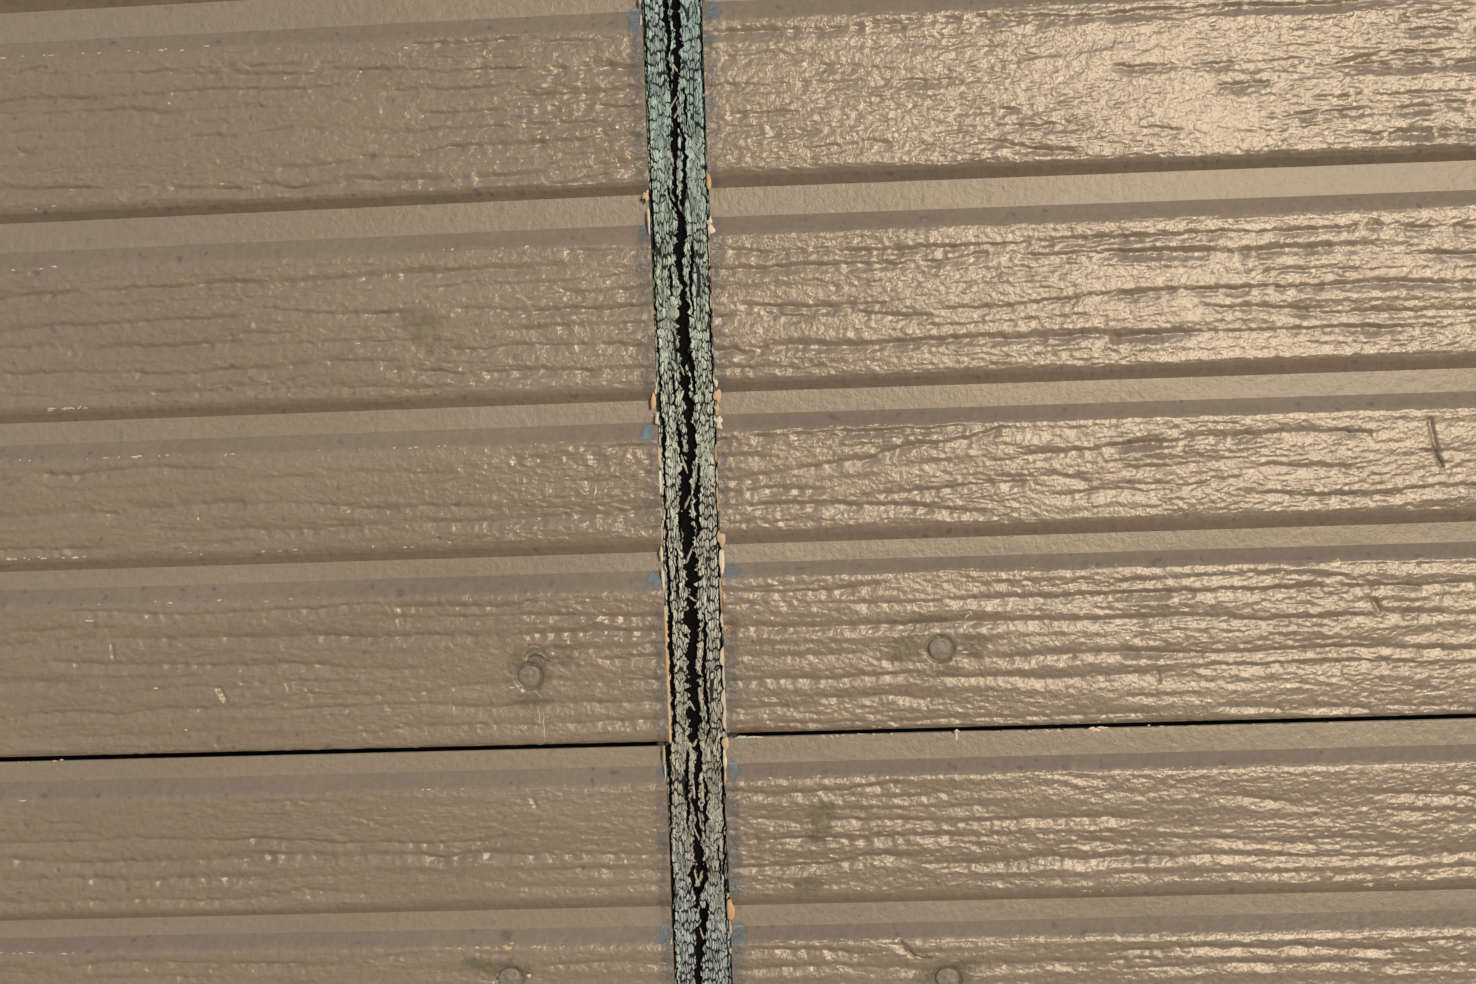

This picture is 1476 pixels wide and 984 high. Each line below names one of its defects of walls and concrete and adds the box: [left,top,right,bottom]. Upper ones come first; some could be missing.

crack [644,0,730,984]